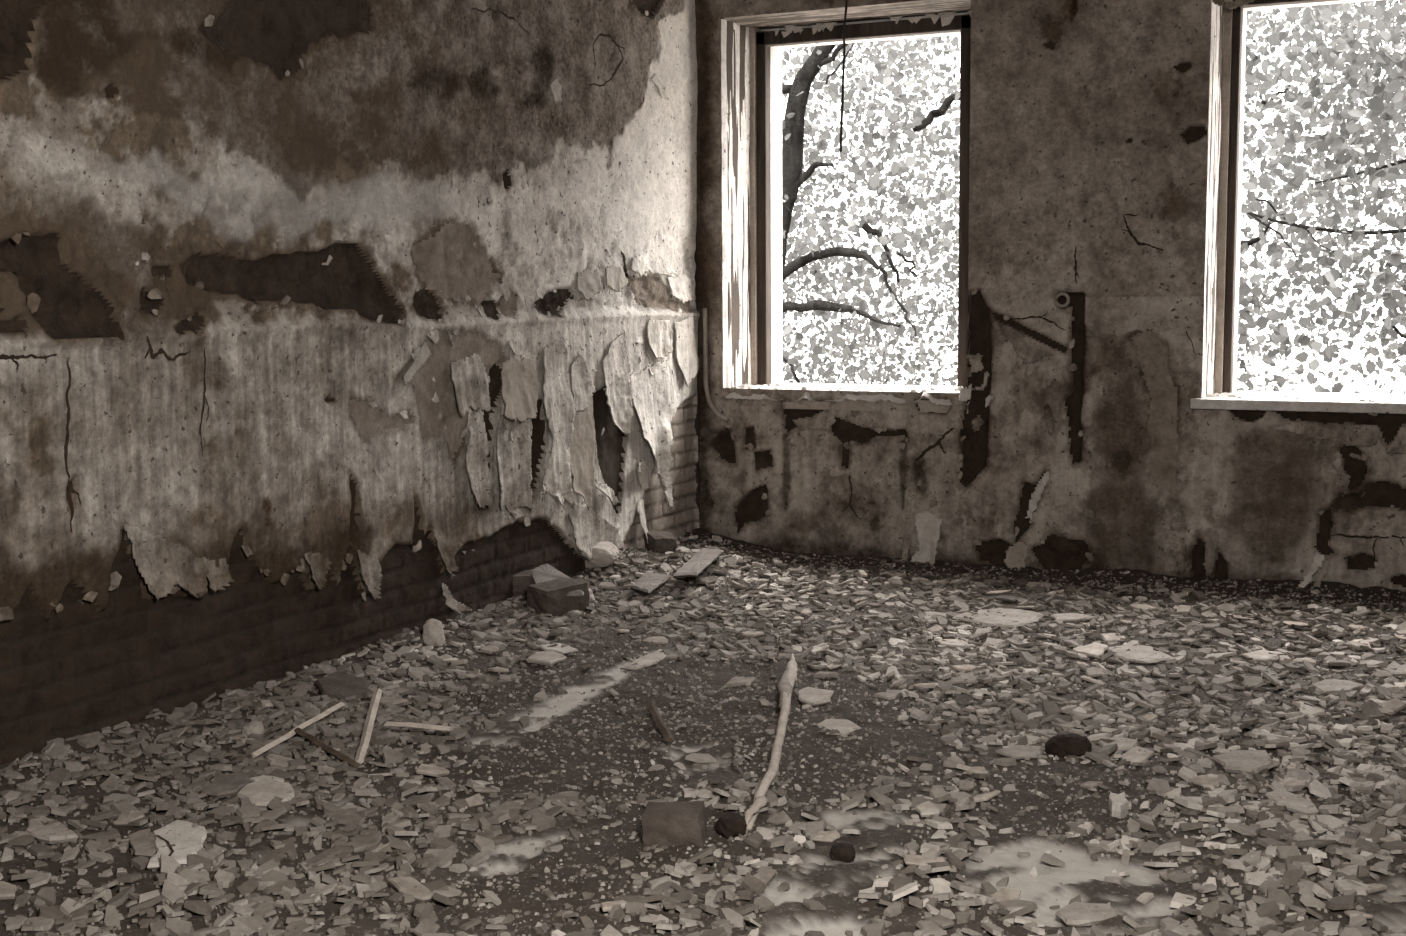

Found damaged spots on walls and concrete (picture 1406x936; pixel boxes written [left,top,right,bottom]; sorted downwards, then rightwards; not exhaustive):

water stain [38,0,684,198]
flaking render [0,220,1095,766]
flaking render [1228,410,1406,588]